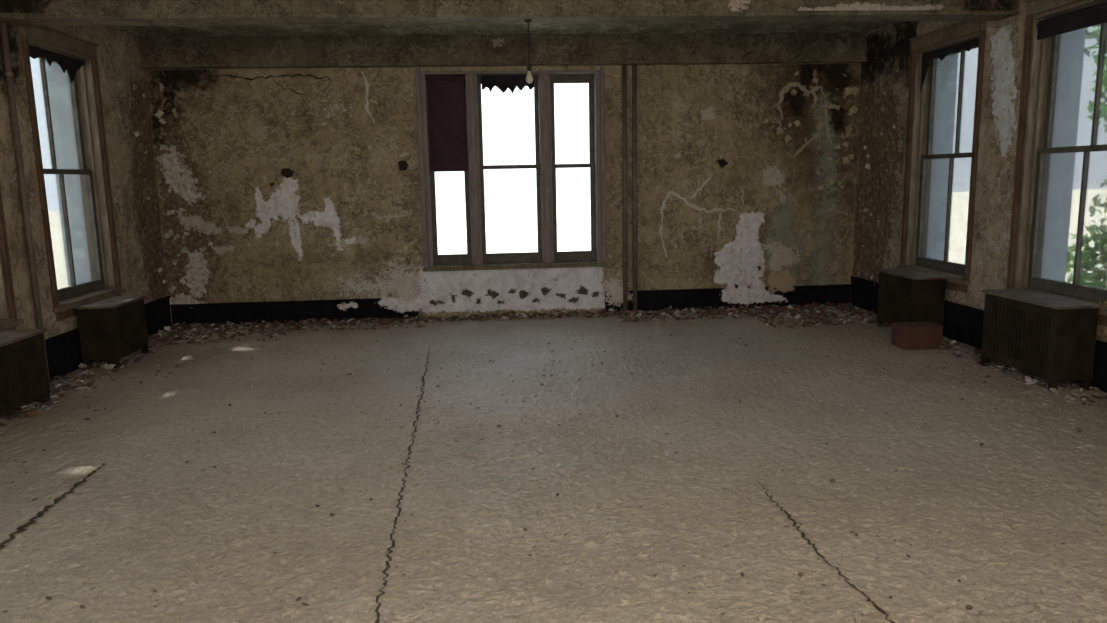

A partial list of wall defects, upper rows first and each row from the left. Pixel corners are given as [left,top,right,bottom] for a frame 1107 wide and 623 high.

flaking render [143,108,633,321]
peeling [713,211,803,306]
peeling [758,161,790,207]
water stain [759,21,916,287]
peeling [988,25,1018,160]
crack [0,463,106,549]